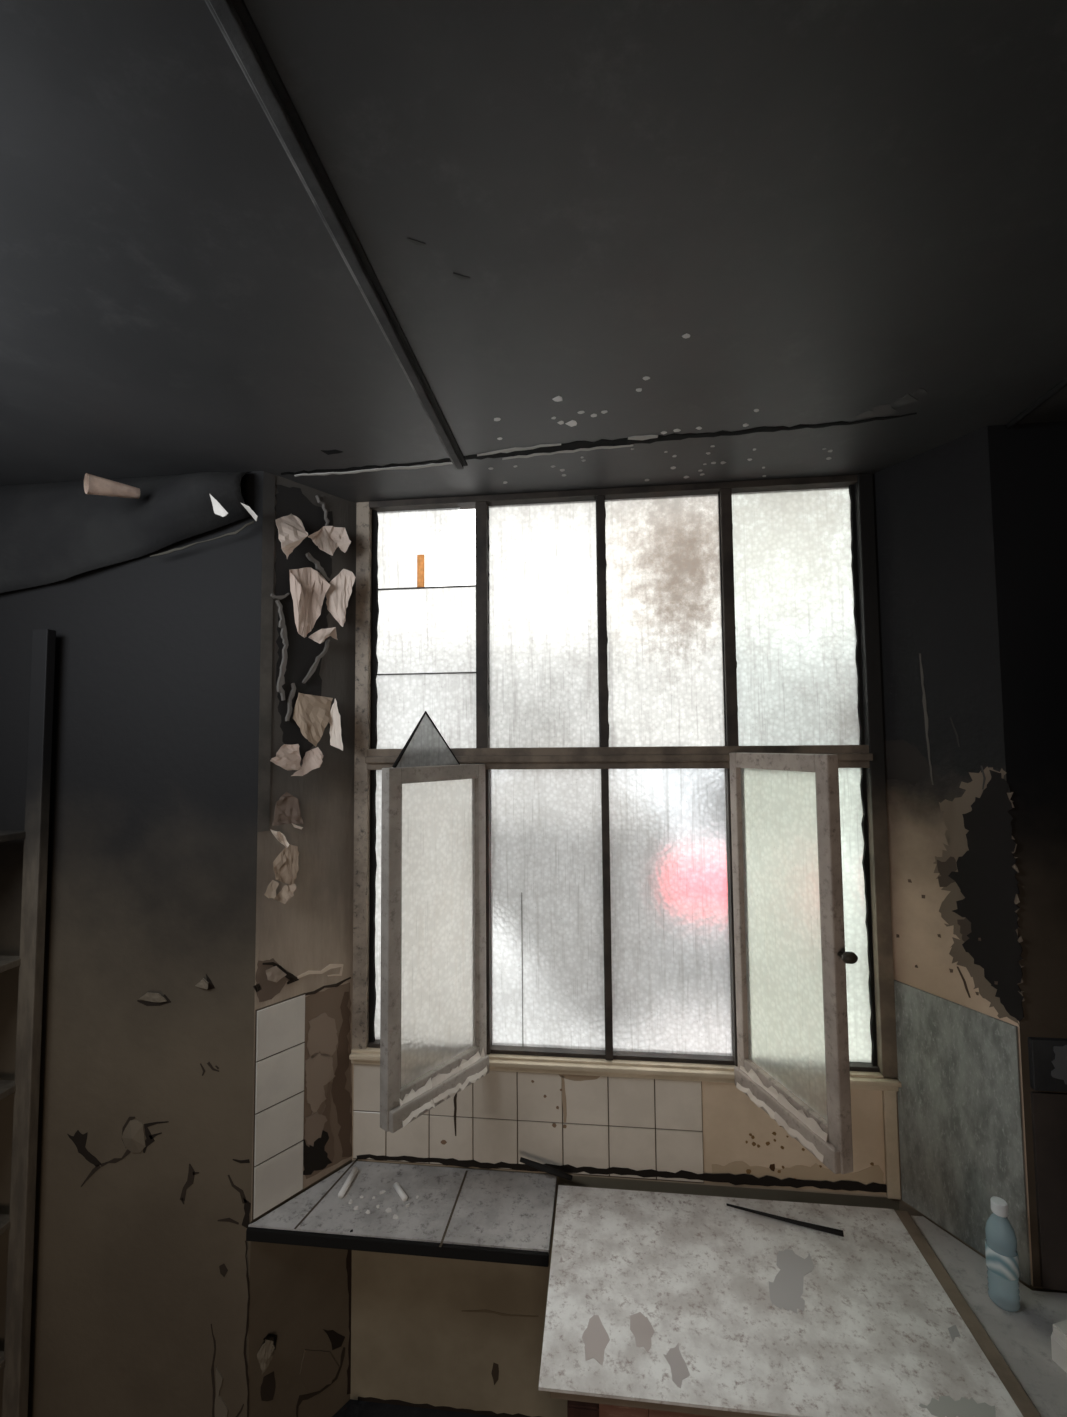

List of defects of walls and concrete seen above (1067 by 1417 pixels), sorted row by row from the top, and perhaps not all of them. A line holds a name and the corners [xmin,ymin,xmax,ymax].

peeling [477,435,658,460]
crack [281,412,917,475]
peeling [210,494,258,521]
flaking render [270,462,452,776]
flaking render [255,958,353,1179]
crack [81,1117,169,1187]
crack [180,1159,277,1417]
crack [296,1347,345,1417]